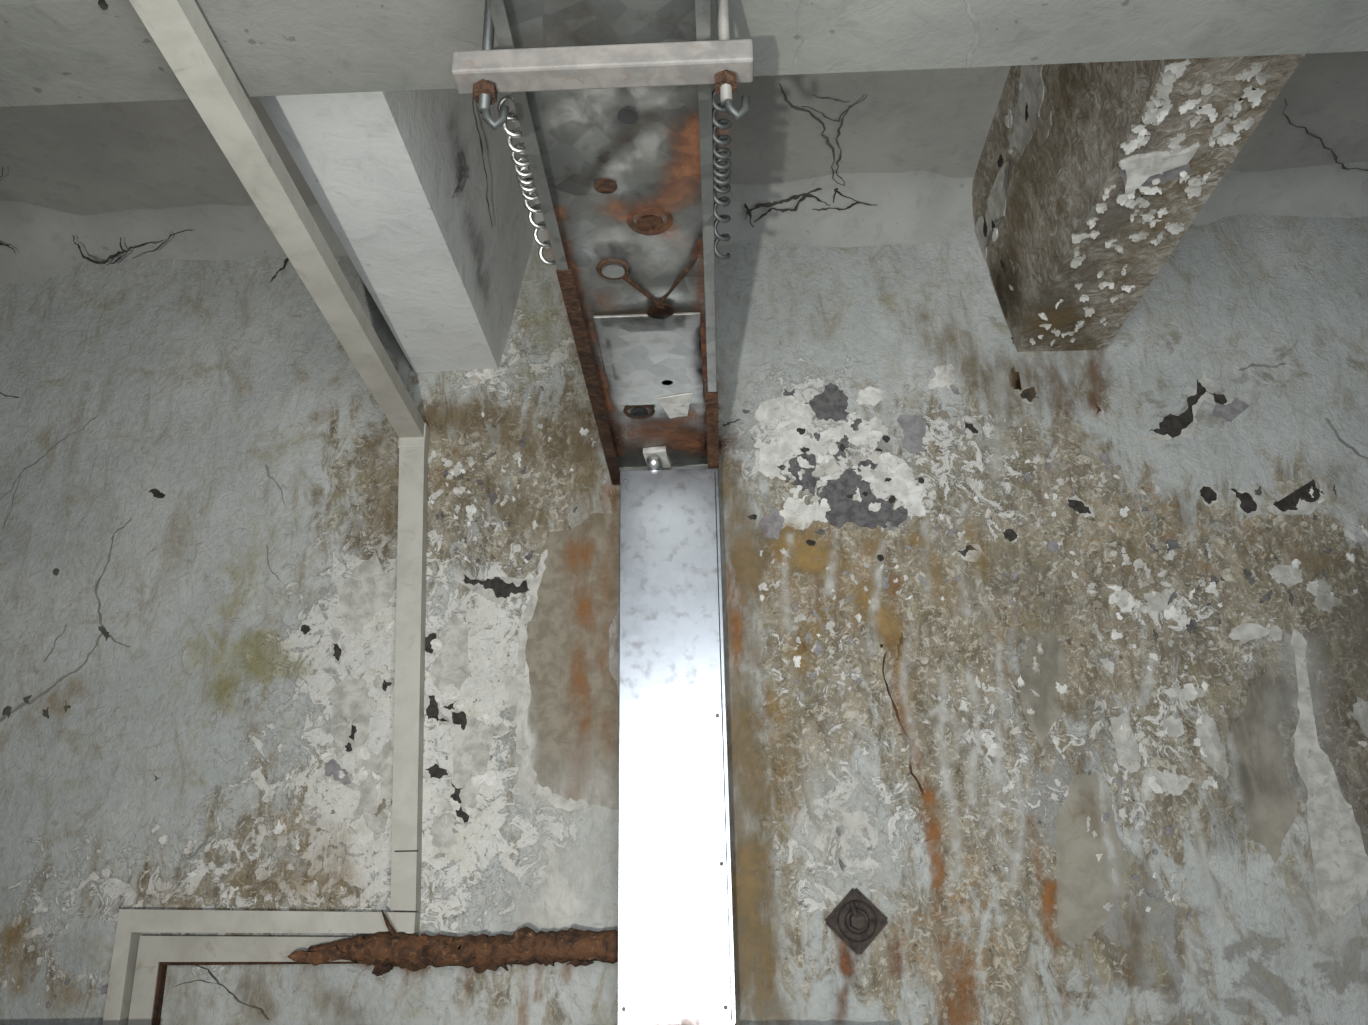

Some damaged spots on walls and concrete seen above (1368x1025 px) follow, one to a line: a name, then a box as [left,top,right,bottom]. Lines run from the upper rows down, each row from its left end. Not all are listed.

peeling [1030,59,1268,346]
spalling [423,418,620,855]
damp [871,568,881,611]
peeling [742,363,1020,685]
peeling [1199,475,1368,614]
damp [522,850,589,933]
corrosion [720,456,836,1023]
corrosion [926,822,944,887]
damp [931,684,953,792]
damp [1282,629,1368,941]
corrosion [654,1008,722,1025]
corrosion [839,939,853,1007]